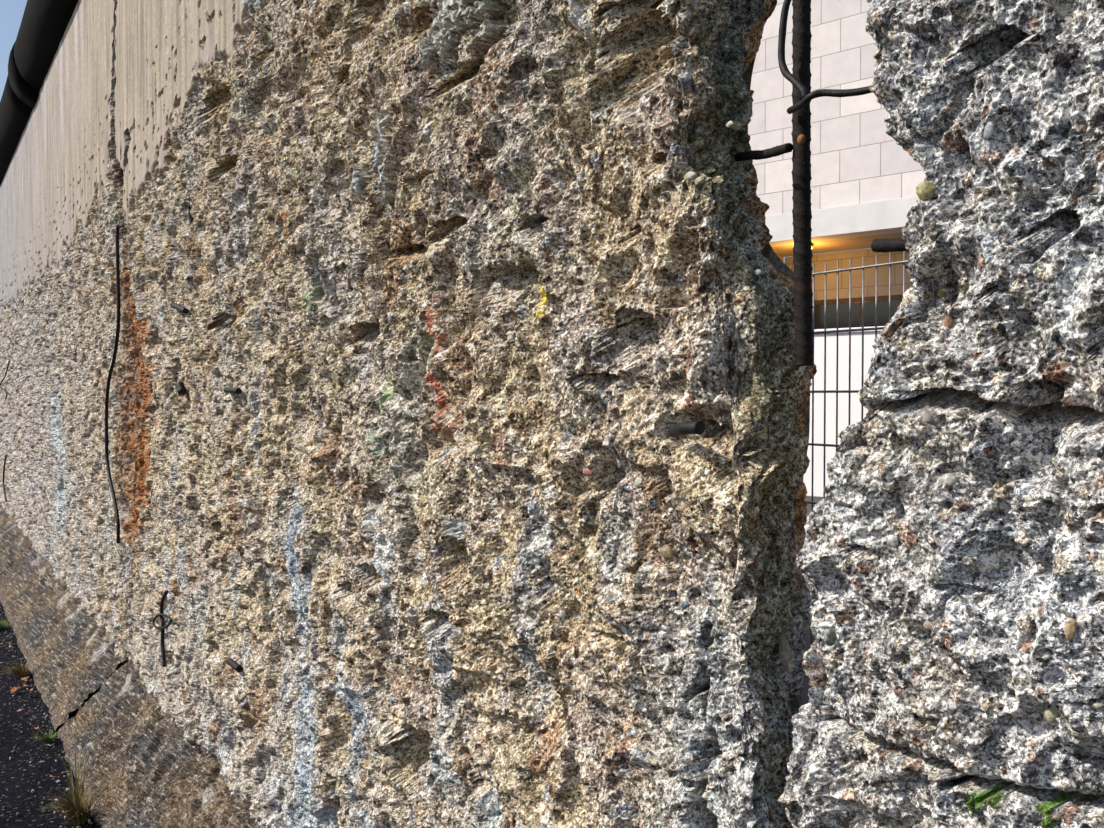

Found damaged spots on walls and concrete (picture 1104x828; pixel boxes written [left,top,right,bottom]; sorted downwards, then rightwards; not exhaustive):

rust [120,313,162,552]